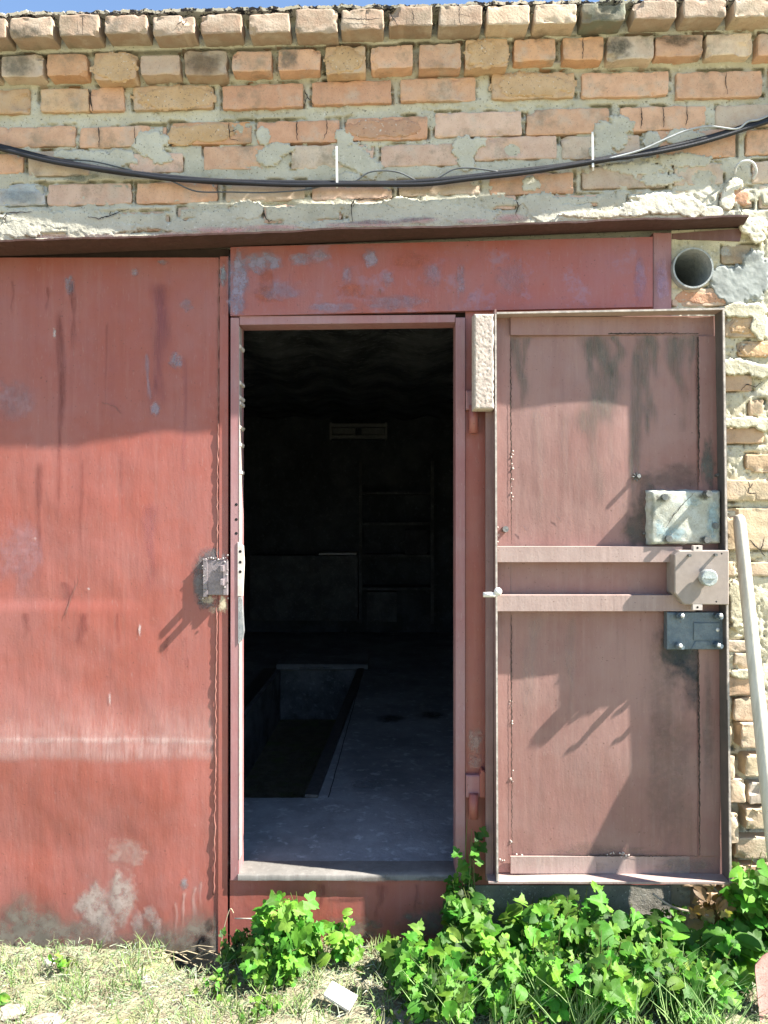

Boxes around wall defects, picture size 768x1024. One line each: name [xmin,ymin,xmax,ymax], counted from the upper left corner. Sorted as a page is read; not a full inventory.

spalling [558,176,751,218]
peeling [220,253,279,314]
spalling [658,270,726,304]